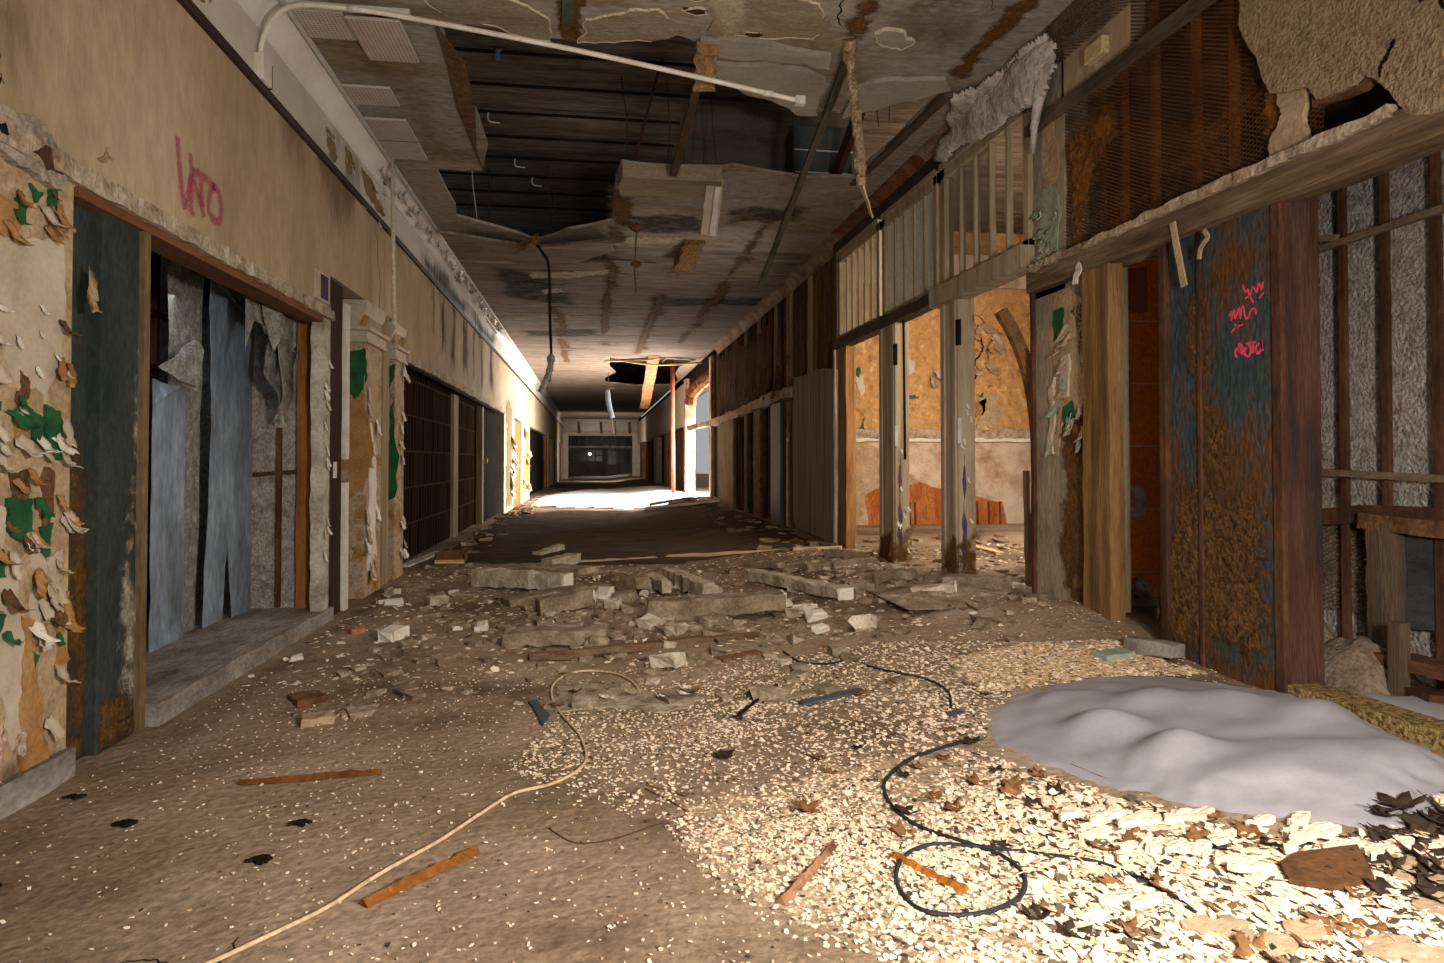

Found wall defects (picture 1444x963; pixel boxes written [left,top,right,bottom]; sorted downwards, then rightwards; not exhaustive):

corrosion [557,0,586,41]
corrosion [844,0,879,38]
spalling [1106,0,1266,224]
spalling [1307,83,1398,135]
spalling [619,163,723,236]
peeling [86,266,102,313]
peeling [0,105,89,771]
peeling [56,287,1444,963]